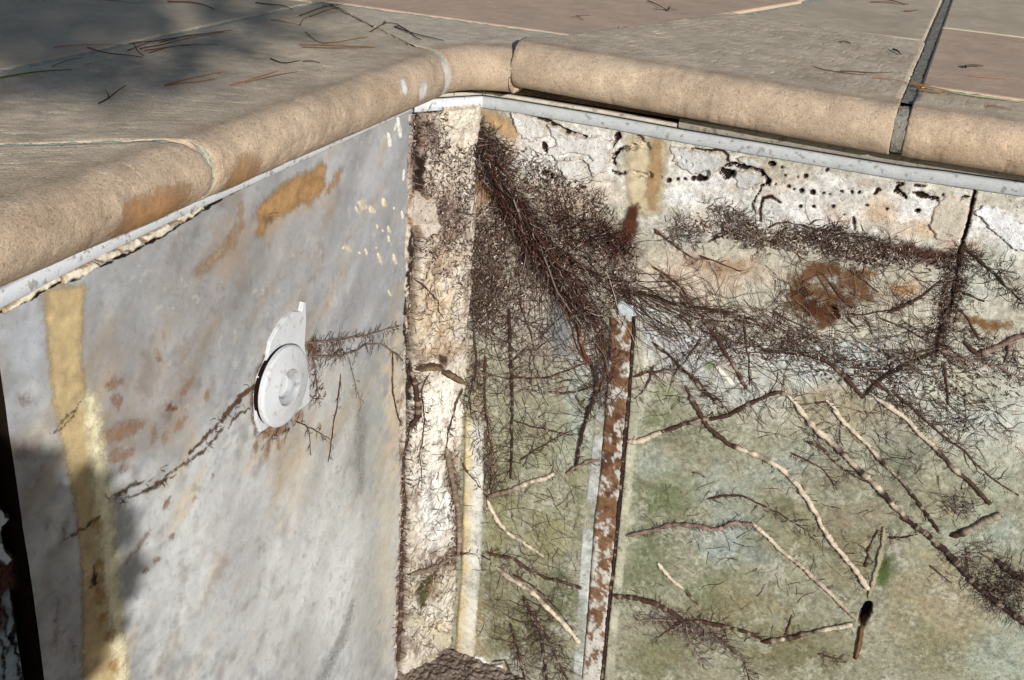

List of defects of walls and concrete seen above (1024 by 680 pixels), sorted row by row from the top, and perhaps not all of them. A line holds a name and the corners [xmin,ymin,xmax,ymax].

peeling [444,104,479,130]
spalling [0,186,249,314]
corrosion [257,164,341,236]
corrosion [605,204,640,257]
peeling [669,144,782,222]
crack [960,189,976,245]
corrosion [784,262,875,329]
damp [83,393,128,680]